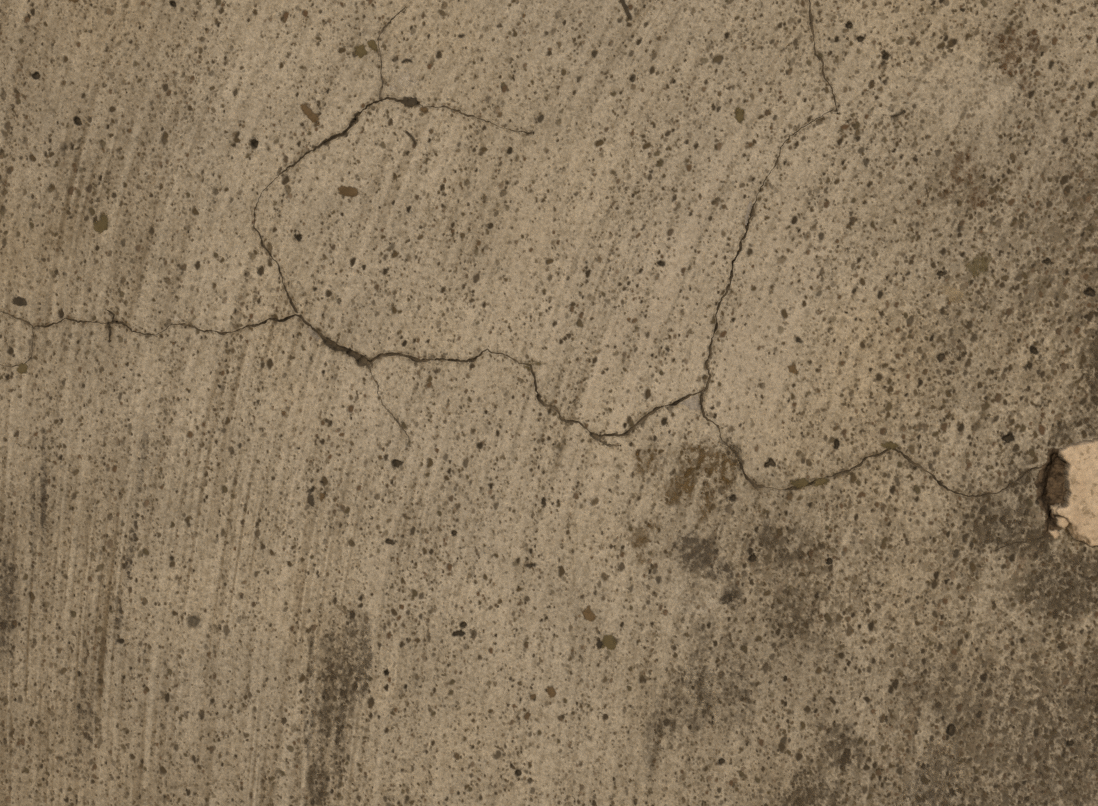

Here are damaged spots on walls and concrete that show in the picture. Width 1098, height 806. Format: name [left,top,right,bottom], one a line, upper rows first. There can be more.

crack [0,0,1042,499]
peeling [1048,503,1069,540]